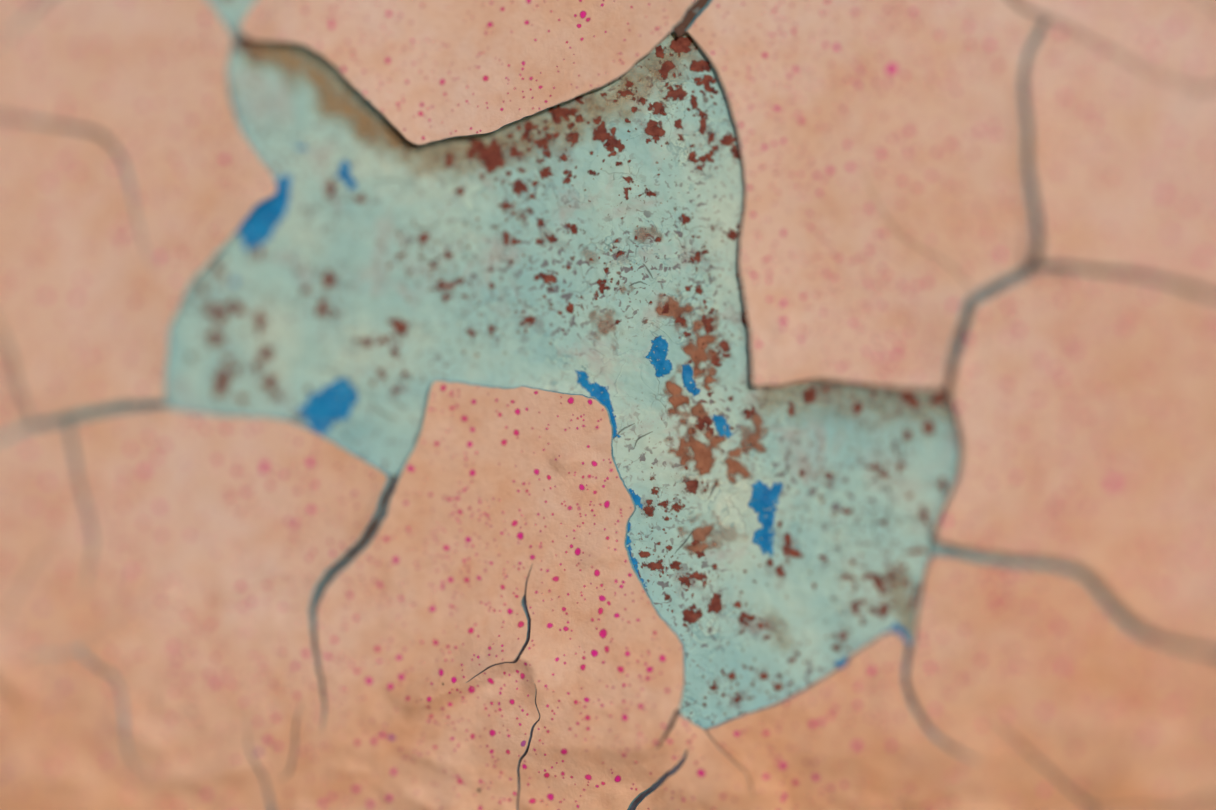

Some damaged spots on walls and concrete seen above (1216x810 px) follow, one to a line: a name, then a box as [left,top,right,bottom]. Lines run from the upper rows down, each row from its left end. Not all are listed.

crack [944,17,1216,394]
peeling [1025,19,1216,294]
rust [179,255,311,422]
rust [292,268,422,426]
peeling [0,0,1044,749]
rust [385,36,951,715]
peeling [936,267,1216,650]
crack [312,474,397,731]
crack [466,564,540,810]
crack [629,710,754,810]
peeling [706,636,909,780]
peeling [907,551,1216,739]